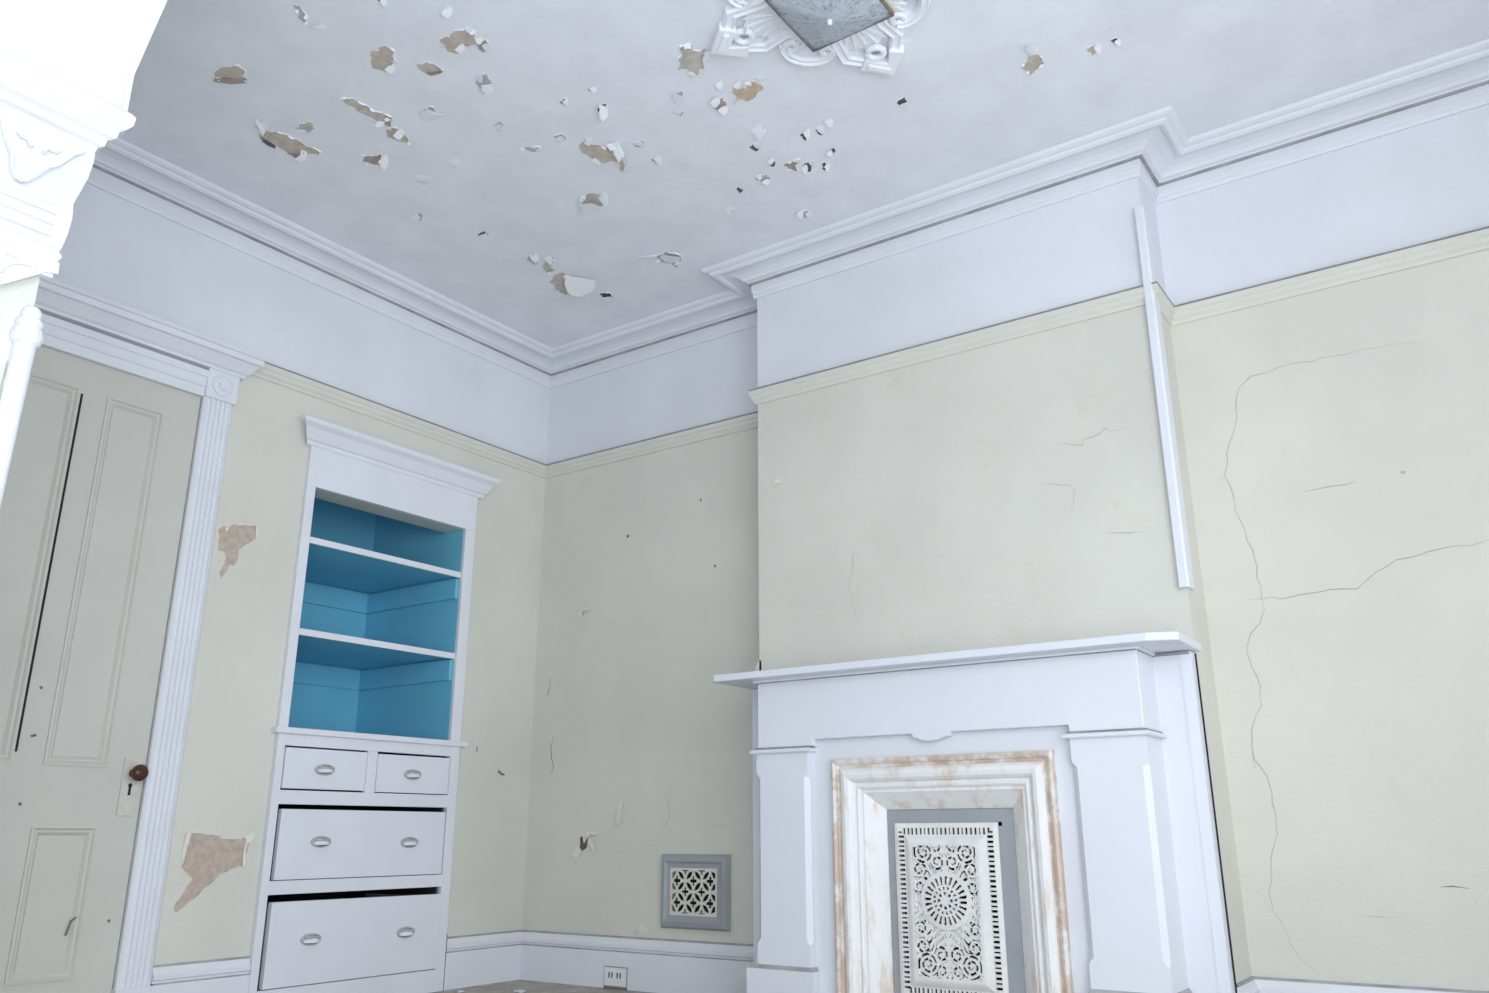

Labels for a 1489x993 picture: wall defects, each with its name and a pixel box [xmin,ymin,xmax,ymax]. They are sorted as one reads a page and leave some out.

peeling [214,64,250,84]
peeling [370,45,398,75]
peeling [416,5,491,76]
peeling [672,41,771,116]
peeling [1020,43,1045,75]
peeling [255,119,321,162]
peeling [338,97,410,171]
peeling [520,133,663,173]
peeling [526,253,614,301]
flaking render [217,522,260,579]
crack [1221,342,1487,965]
flaking render [173,832,254,913]